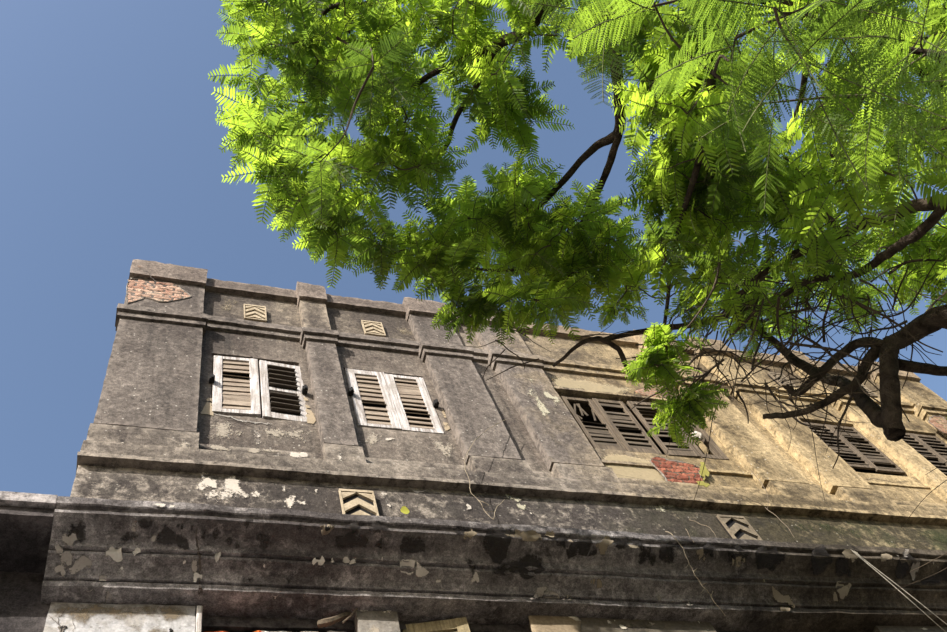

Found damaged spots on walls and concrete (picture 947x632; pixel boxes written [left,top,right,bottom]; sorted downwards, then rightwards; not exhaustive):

peeling [54,520,92,577]
spalling [105,519,240,570]
spalling [728,544,795,611]
spalling [811,544,858,601]
spalling [881,549,947,584]